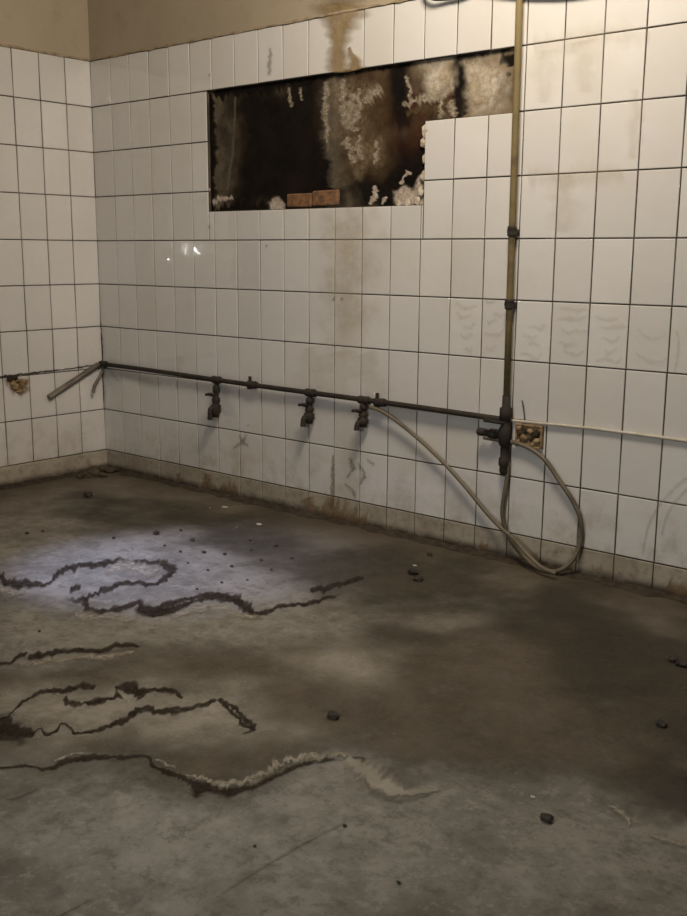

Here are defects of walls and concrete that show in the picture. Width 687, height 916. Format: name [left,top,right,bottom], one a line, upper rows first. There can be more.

water stain [322,3,361,72]
spalling [209,48,514,211]
spalling [6,376,28,395]
crack [0,557,364,666]